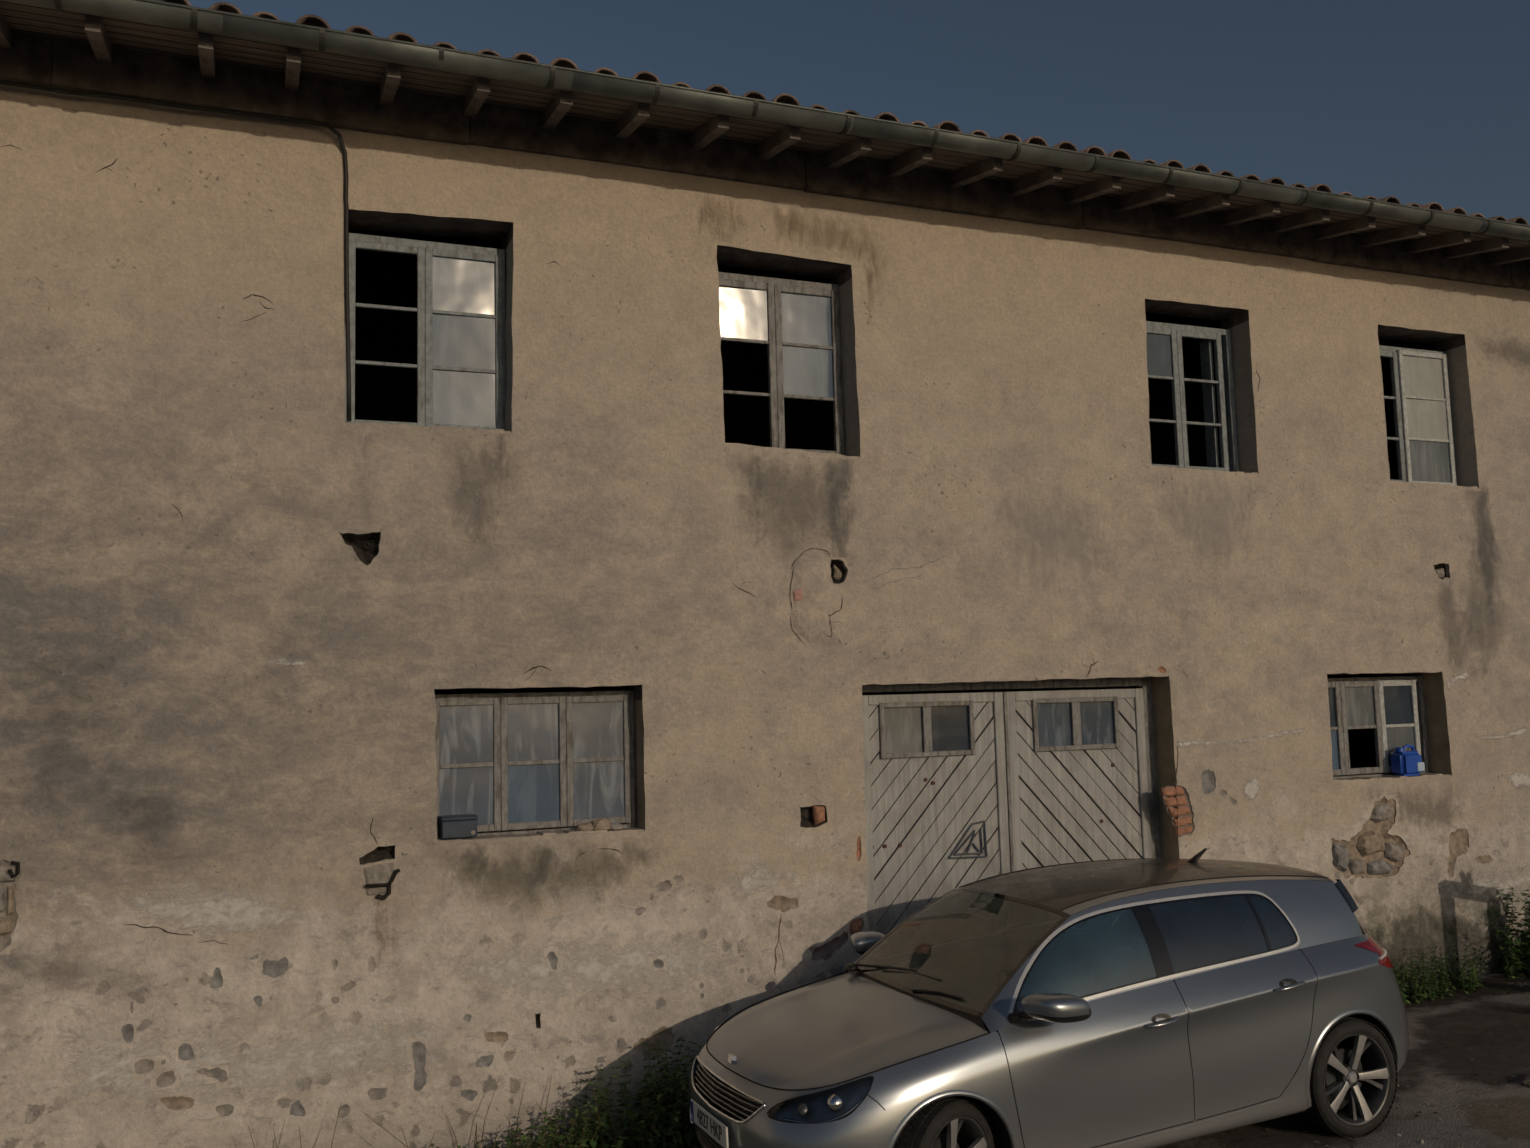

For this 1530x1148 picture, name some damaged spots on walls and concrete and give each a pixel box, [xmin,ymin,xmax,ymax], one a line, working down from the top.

flaking render [1160,769,1260,837]
spalling [1330,796,1410,879]
flaking render [1441,828,1530,901]
spalling [766,896,798,912]
crack [126,924,225,944]
spalling [811,918,864,961]
spalling [633,1026,675,1059]